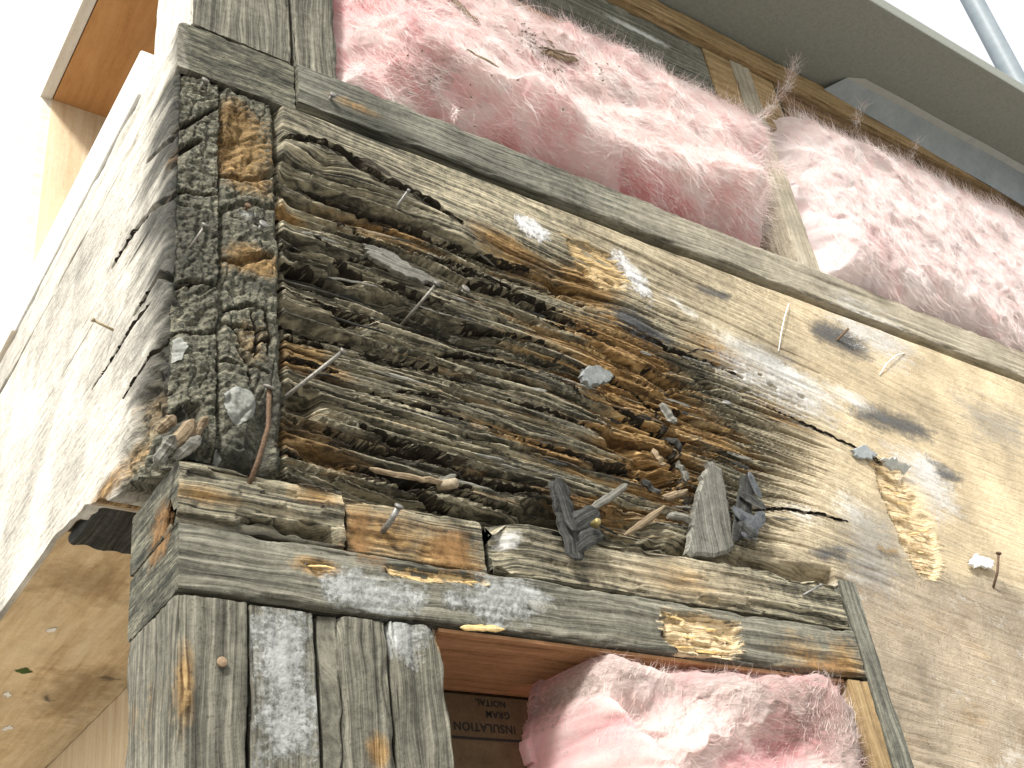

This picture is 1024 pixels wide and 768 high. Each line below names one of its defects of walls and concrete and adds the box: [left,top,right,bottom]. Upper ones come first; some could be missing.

crack [114,111,212,266]
crack [177,283,212,291]
crack [94,290,151,387]
crack [220,133,882,517]
damp [811,322,867,354]
crack [122,331,197,399]
damp [852,409,927,436]
crack [752,507,848,522]
peeling [665,615,736,654]